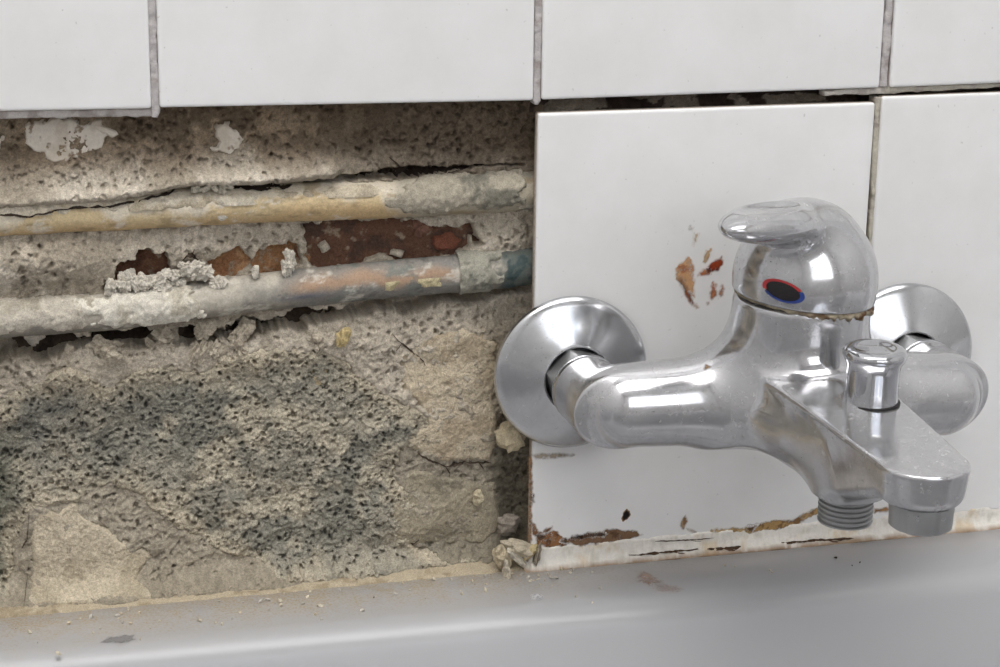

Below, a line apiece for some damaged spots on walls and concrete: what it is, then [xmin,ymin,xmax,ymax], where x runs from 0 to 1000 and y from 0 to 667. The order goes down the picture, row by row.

flaking render [23,117,118,162]
flaking render [210,121,244,154]
crack [200,157,501,191]
crack [0,189,176,218]
flaking render [207,218,479,276]
flaking render [104,248,169,285]
corrosion [676,249,723,304]
spalling [0,347,476,597]
corrosion [711,508,818,534]